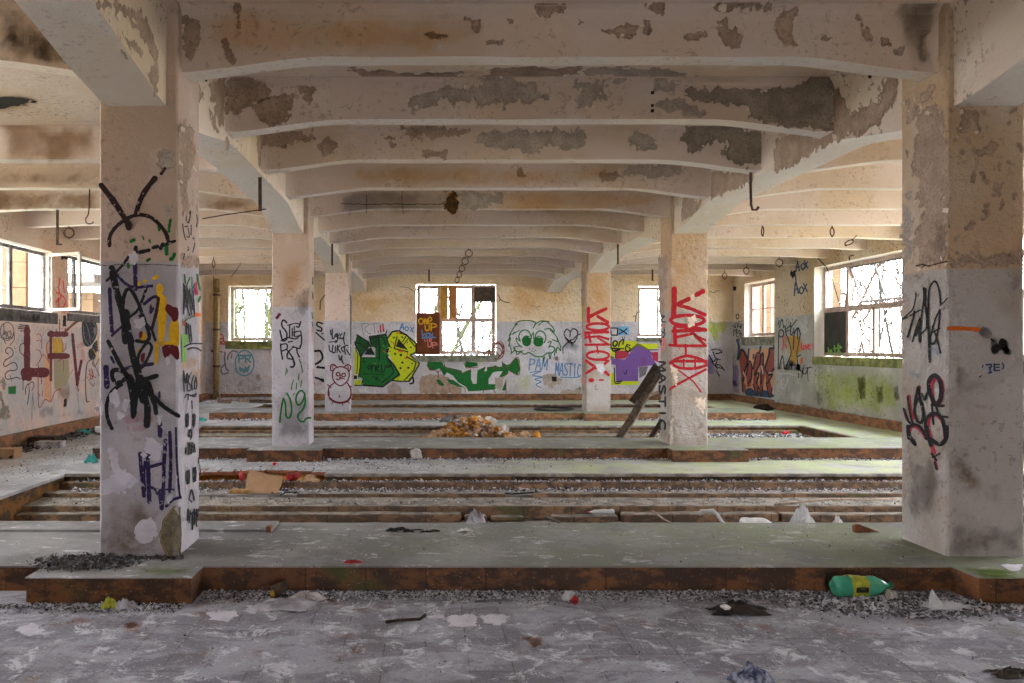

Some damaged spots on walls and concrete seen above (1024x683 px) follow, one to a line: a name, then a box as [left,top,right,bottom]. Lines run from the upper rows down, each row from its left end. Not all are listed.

peeling [96,0,159,97]
peeling [683,1,772,50]
peeling [199,38,339,168]
peeling [156,118,198,217]
peeling [339,65,1024,272]